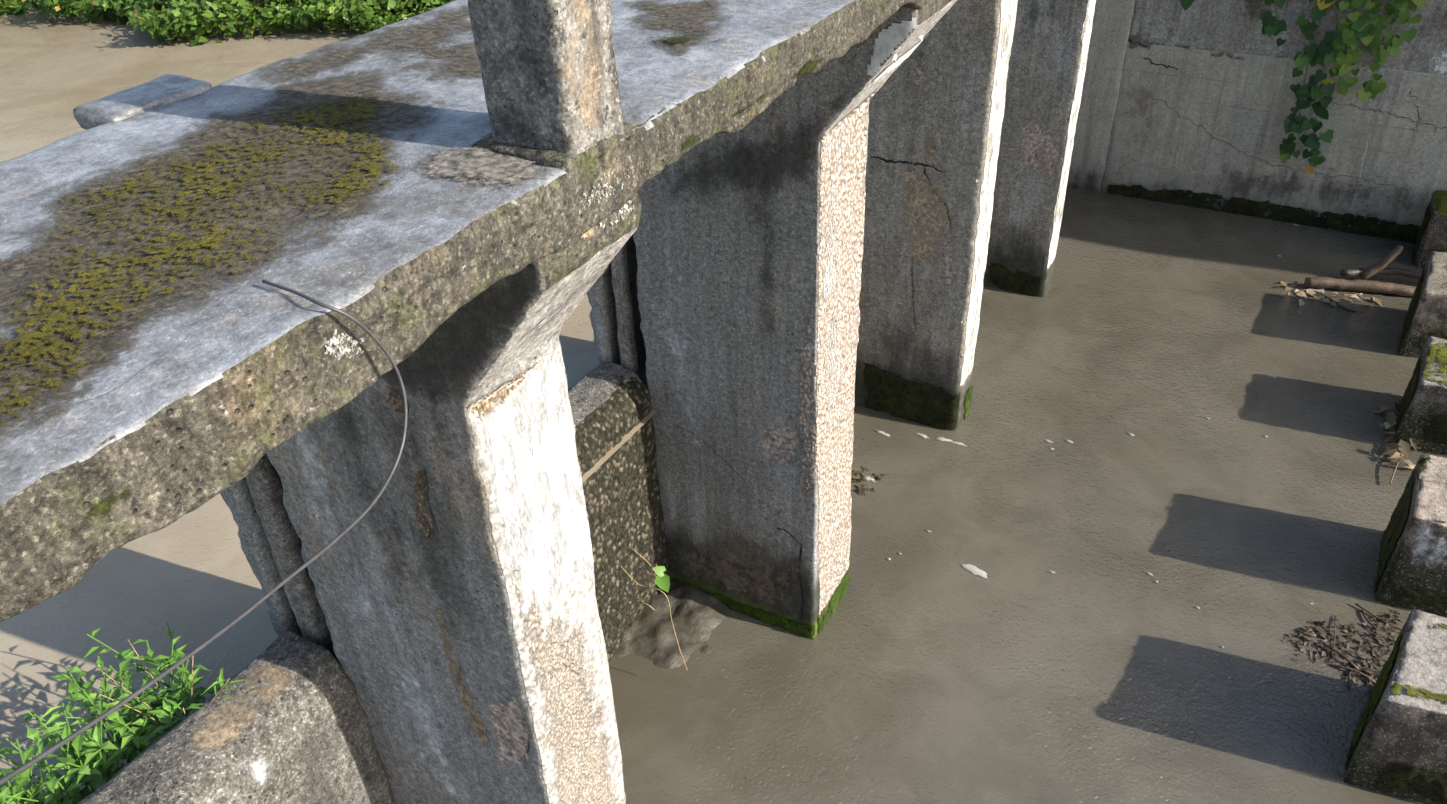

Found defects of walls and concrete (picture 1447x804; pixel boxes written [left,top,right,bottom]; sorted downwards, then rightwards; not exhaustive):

damp [1128,35,1184,50]
damp [1430,49,1447,74]
crack [1128,38,1447,200]
damp [673,119,823,200]
crack [871,156,951,226]
damp [1230,169,1411,210]
spalling [757,18,929,617]
damp [682,531,802,607]